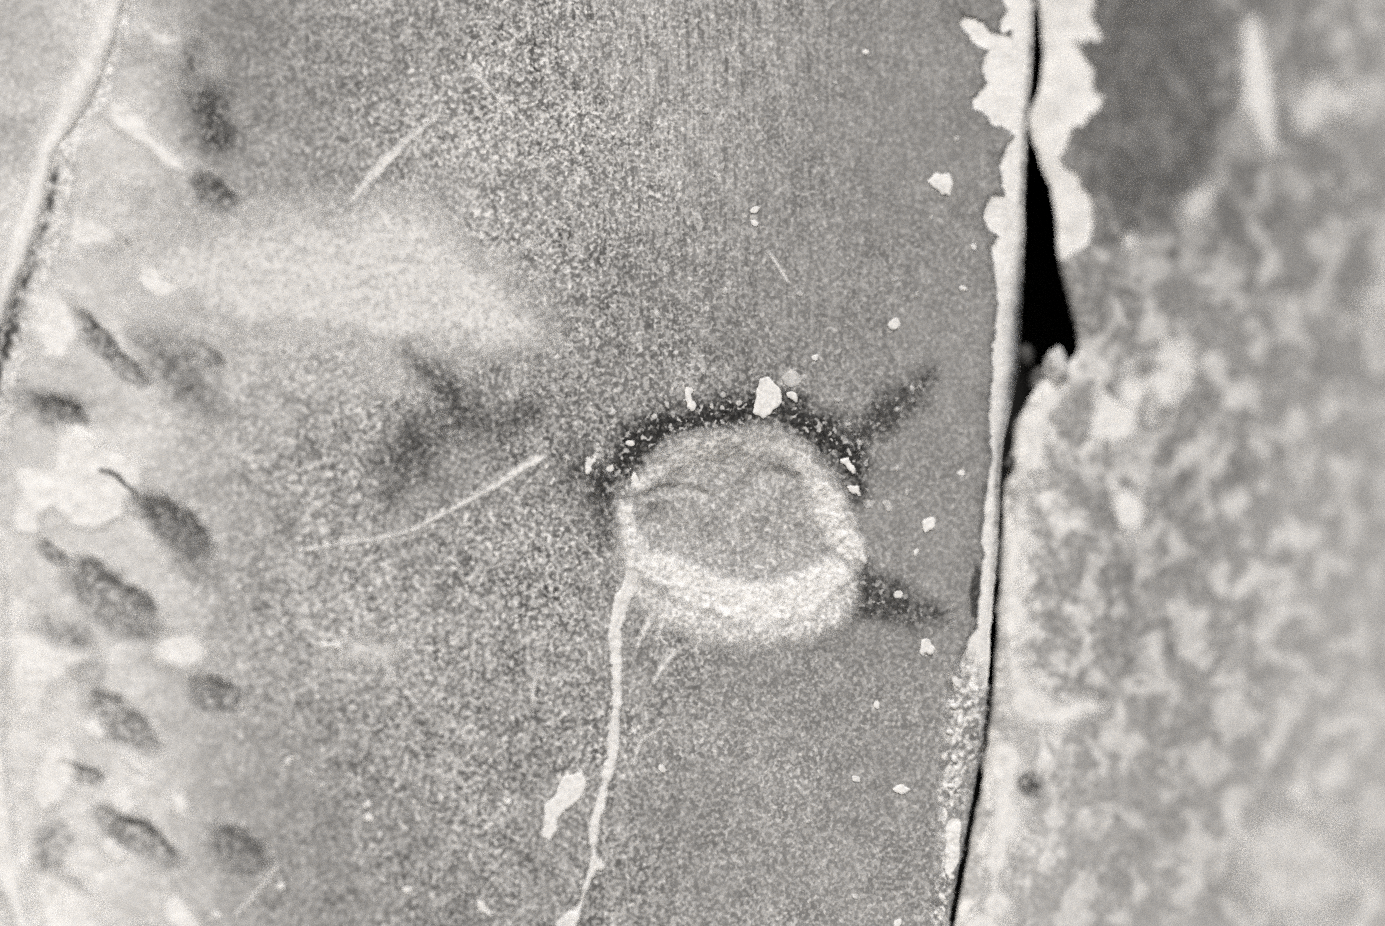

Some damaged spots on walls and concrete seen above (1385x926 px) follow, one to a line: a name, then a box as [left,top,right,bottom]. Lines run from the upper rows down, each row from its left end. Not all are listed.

water stain [69,189,555,498]
water stain [343,637,402,671]
water stain [568,371,941,915]
crack [948,0,1079,926]
spalling [930,0,1103,926]